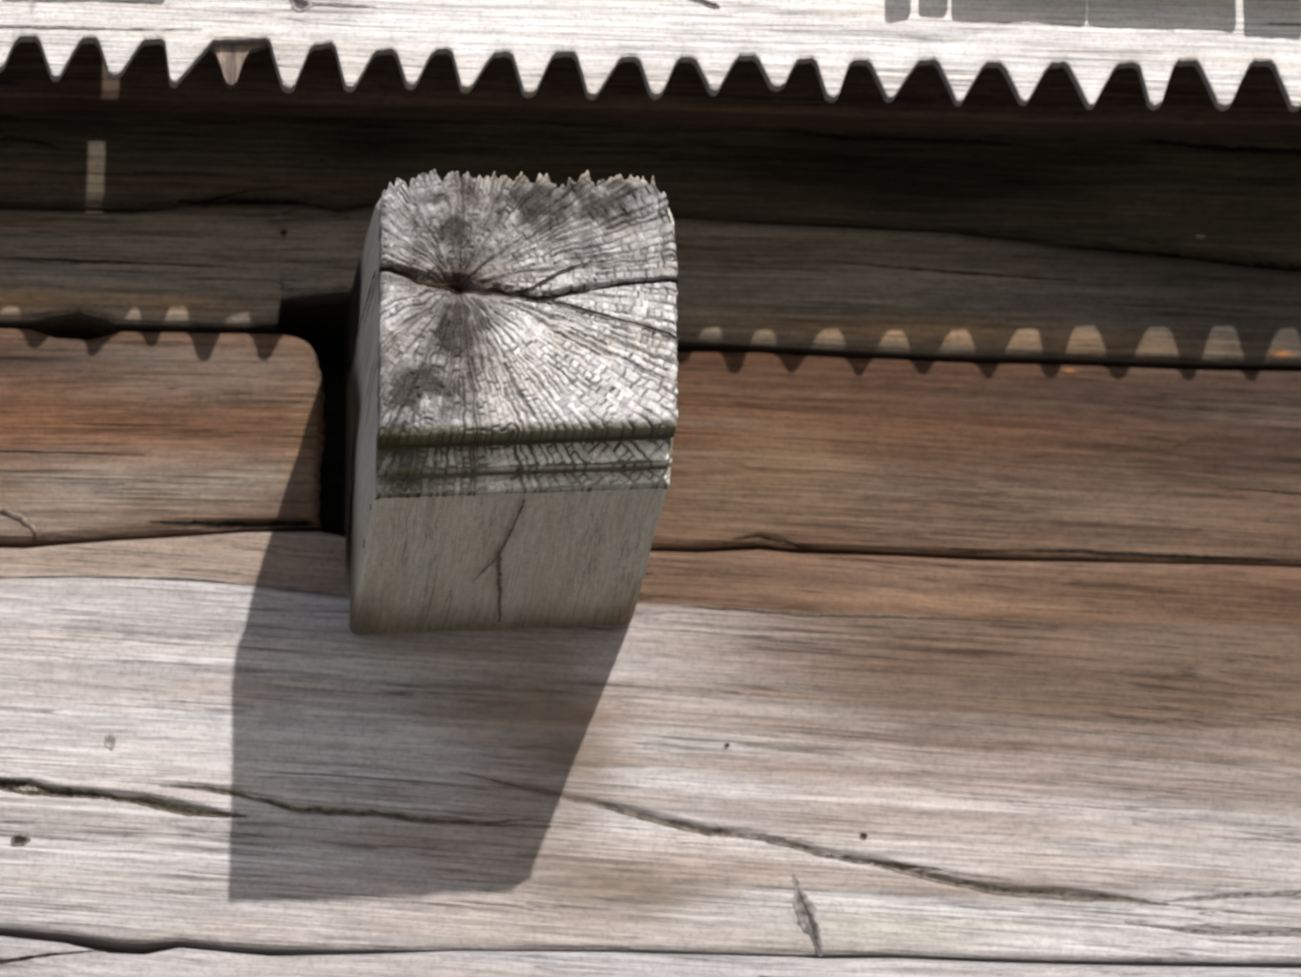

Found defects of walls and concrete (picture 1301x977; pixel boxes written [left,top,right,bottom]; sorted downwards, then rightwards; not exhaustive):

crack [353,261,680,422]
crack [472,500,526,622]
crack [0,772,1301,936]
crack [0,950,106,963]